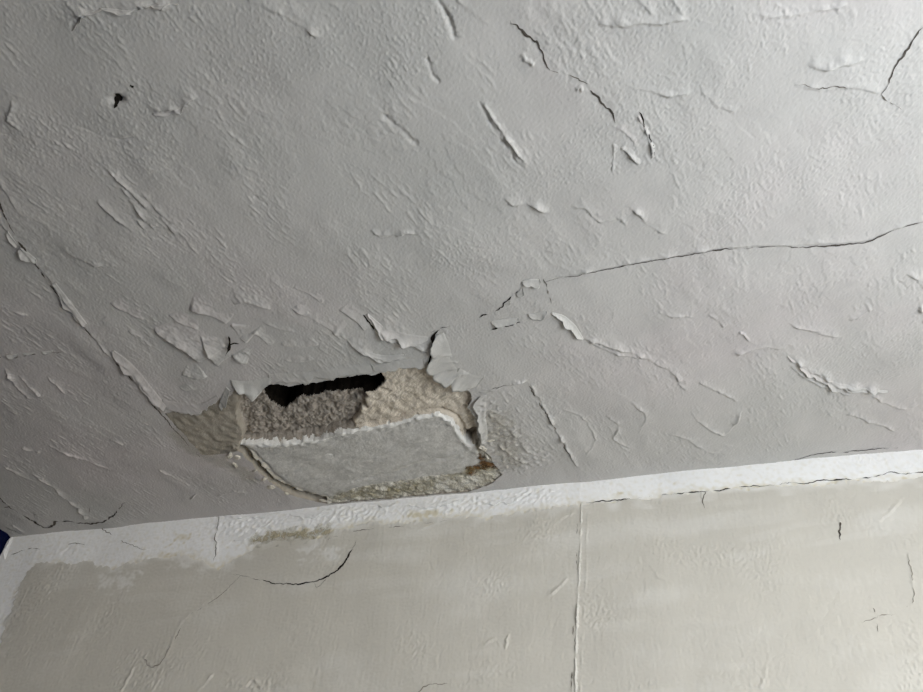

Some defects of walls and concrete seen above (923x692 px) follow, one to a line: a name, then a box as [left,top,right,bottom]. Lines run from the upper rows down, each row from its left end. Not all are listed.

crack [882,28,922,109]
crack [0,203,90,335]
crack [543,222,922,300]
crack [479,292,519,330]
crack [110,350,200,457]
flaking render [162,313,503,504]
crack [0,498,146,555]
crack [208,526,402,604]